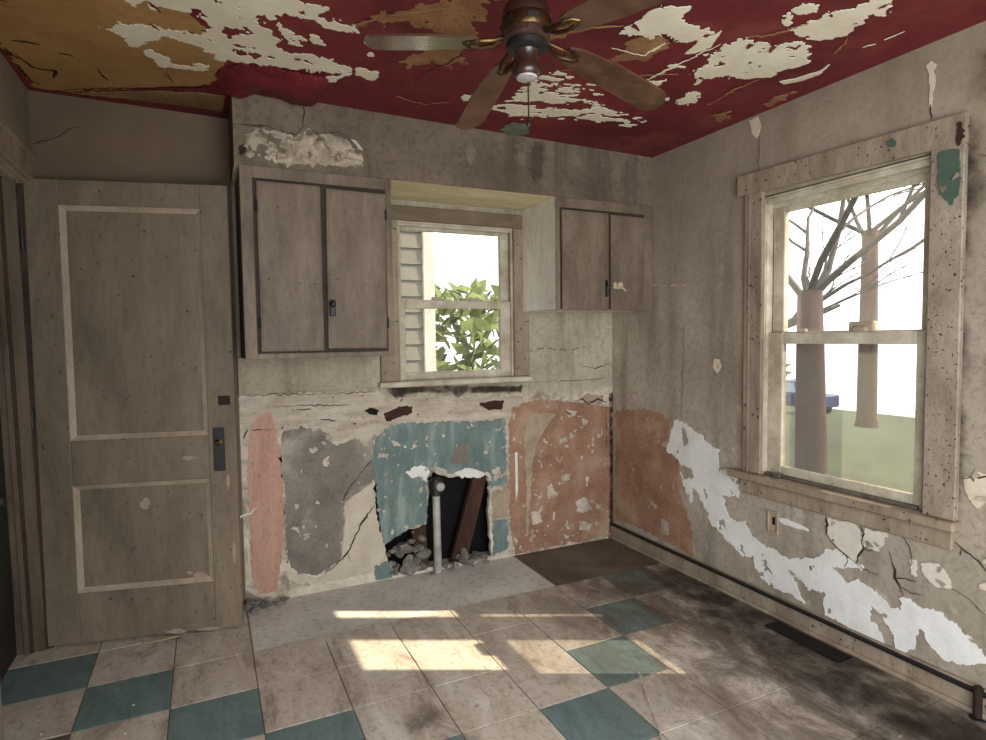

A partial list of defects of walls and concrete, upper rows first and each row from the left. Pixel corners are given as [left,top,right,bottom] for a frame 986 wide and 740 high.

peeling [0,0,500,111]
peeling [491,71,647,127]
peeling [610,0,893,138]
peeling [937,121,966,205]
crack [325,505,375,573]
peeling [239,391,986,665]
crack [825,517,920,595]
crack [954,541,986,571]